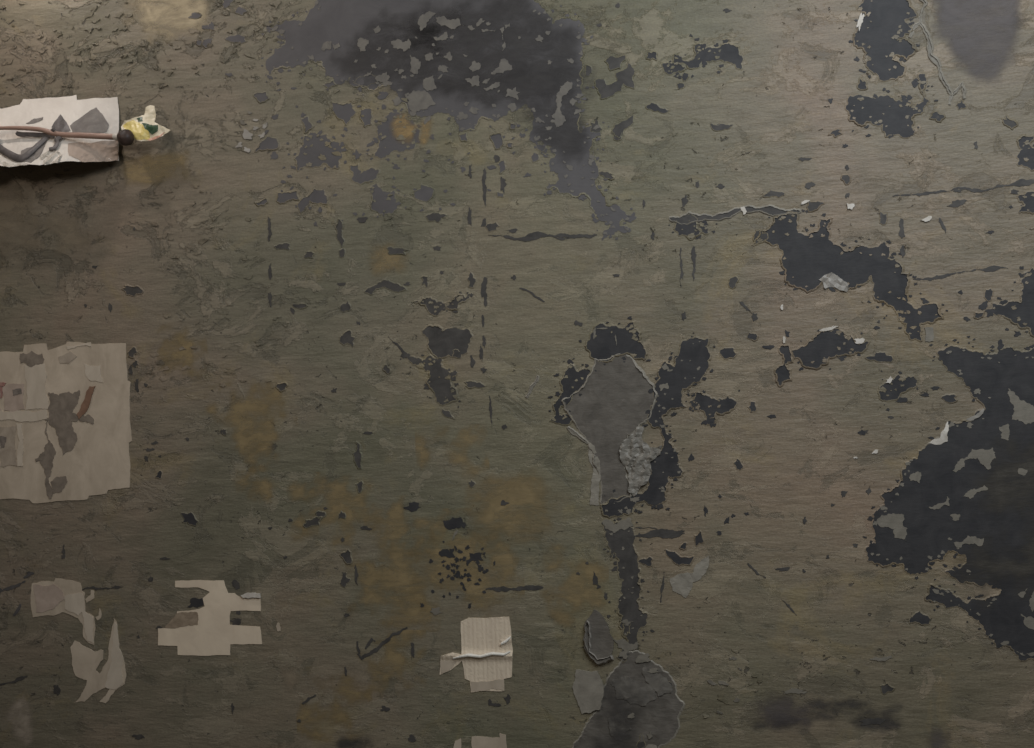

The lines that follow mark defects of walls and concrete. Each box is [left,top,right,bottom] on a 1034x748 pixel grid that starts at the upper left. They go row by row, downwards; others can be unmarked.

flaking render [0,0,645,258]
leakage [344,0,585,154]
peeling [645,102,670,114]
peeling [645,34,744,90]
peeling [840,165,855,210]
peeling [828,0,946,148]
leakage [937,0,1018,78]
peeling [1002,114,1034,230]
peeling [364,271,507,430]
peeling [740,182,1034,662]
peeling [429,517,495,609]
spalling [548,316,776,748]